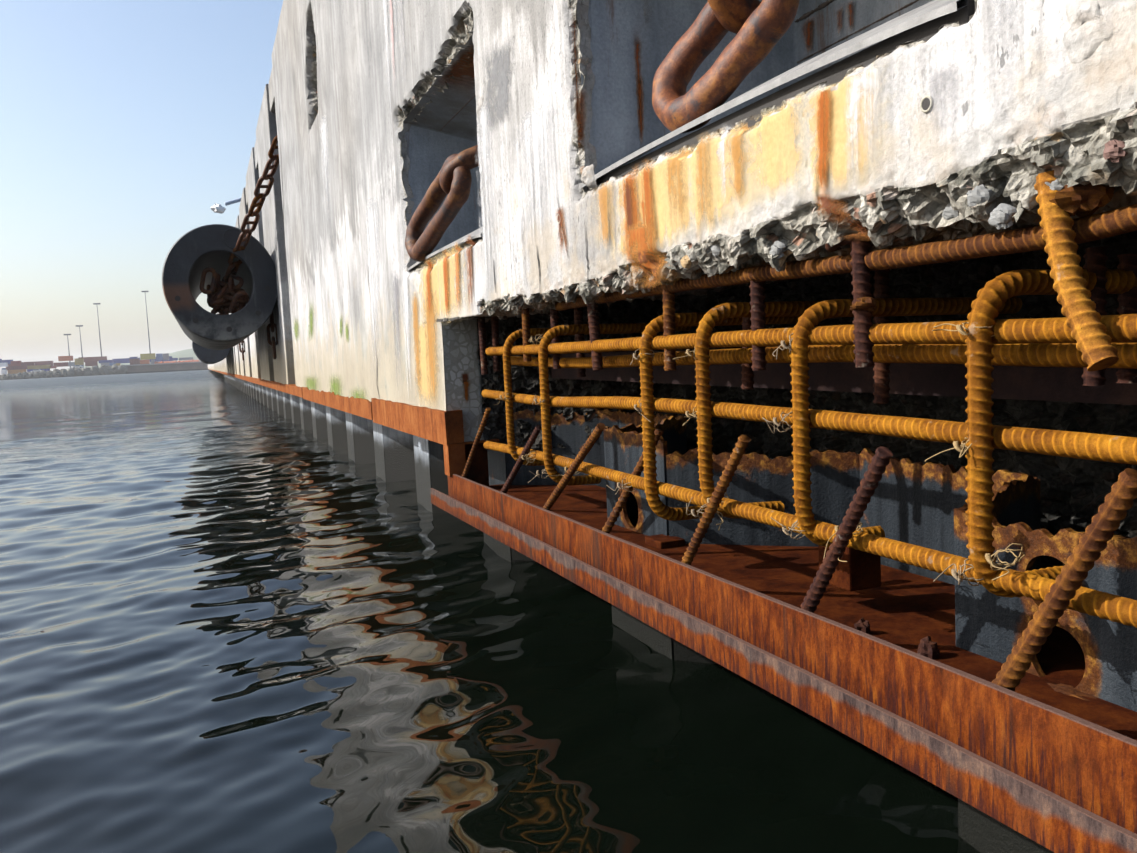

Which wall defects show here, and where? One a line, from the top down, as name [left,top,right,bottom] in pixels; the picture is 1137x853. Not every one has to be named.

spalling [306,17,318,129]
spalling [397,1,474,124]
spalling [569,0,585,136]
spalling [847,40,925,76]
spalling [937,0,977,34]
spalling [574,82,826,201]
corrosion [598,67,878,284]
corrosion [413,238,476,398]
spalling [477,102,1137,566]
spalling [801,427,968,613]
spalling [991,448,1137,692]